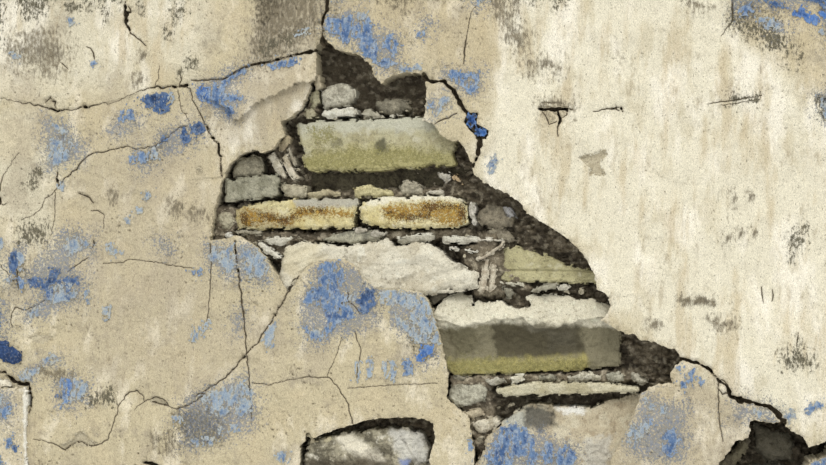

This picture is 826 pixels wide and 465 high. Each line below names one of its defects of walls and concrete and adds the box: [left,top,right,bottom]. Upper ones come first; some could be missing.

crack [1,0,329,325]
flaking render [185,0,706,465]
peeling [807,87,826,127]
crack [0,371,33,413]
peeling [0,222,124,465]
crack [33,241,437,450]
flaking render [714,390,826,465]